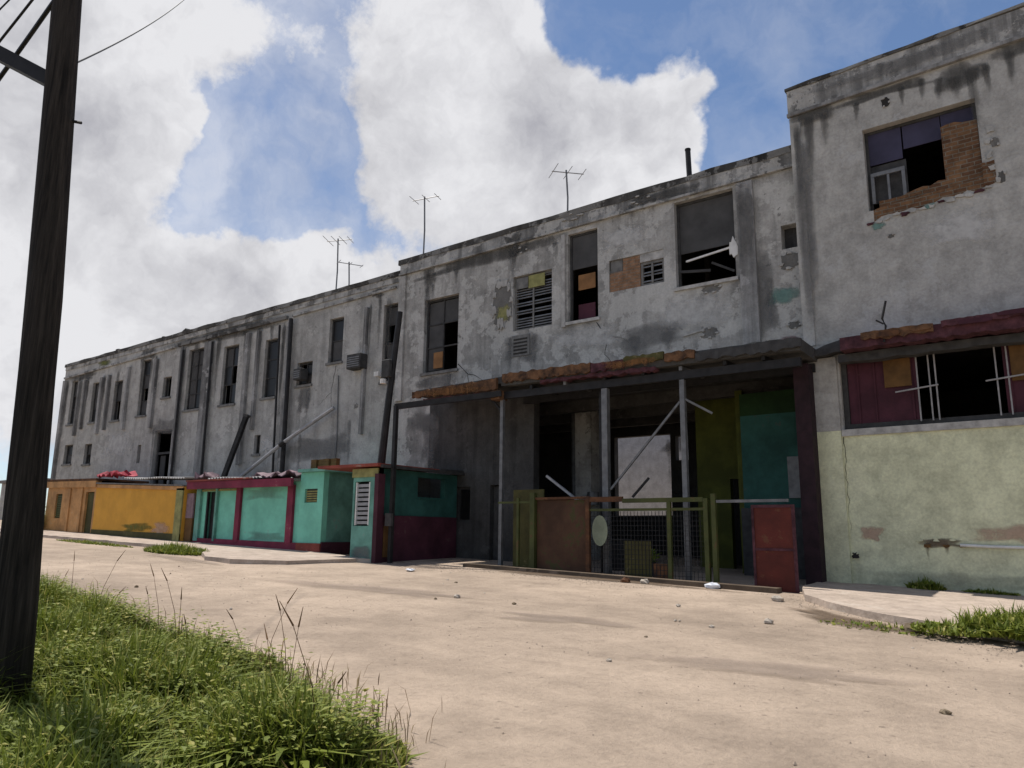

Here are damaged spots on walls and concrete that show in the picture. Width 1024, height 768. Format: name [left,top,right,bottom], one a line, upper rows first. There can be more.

leakage [855,38,964,79]
leakage [1002,41,1024,68]
leakage [936,64,989,91]
leakage [843,80,923,112]
spalling [867,125,1006,238]
spalling [490,279,514,331]
peeling [861,528,882,541]
peeling [916,538,961,549]
peeling [982,526,1024,541]